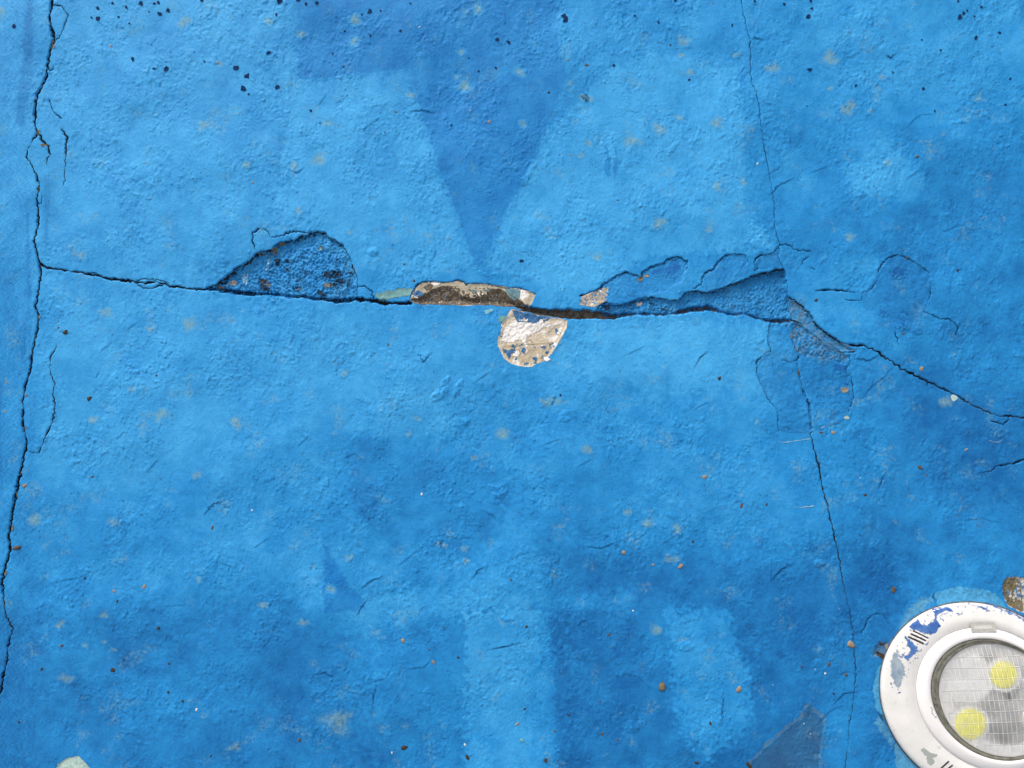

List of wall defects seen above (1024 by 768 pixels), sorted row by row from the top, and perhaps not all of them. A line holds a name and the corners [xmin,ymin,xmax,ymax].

crack [0,0,412,694]
flaking render [208,228,567,367]
peeling [579,244,856,433]
crack [522,0,1024,767]
peeling [1003,577,1024,613]